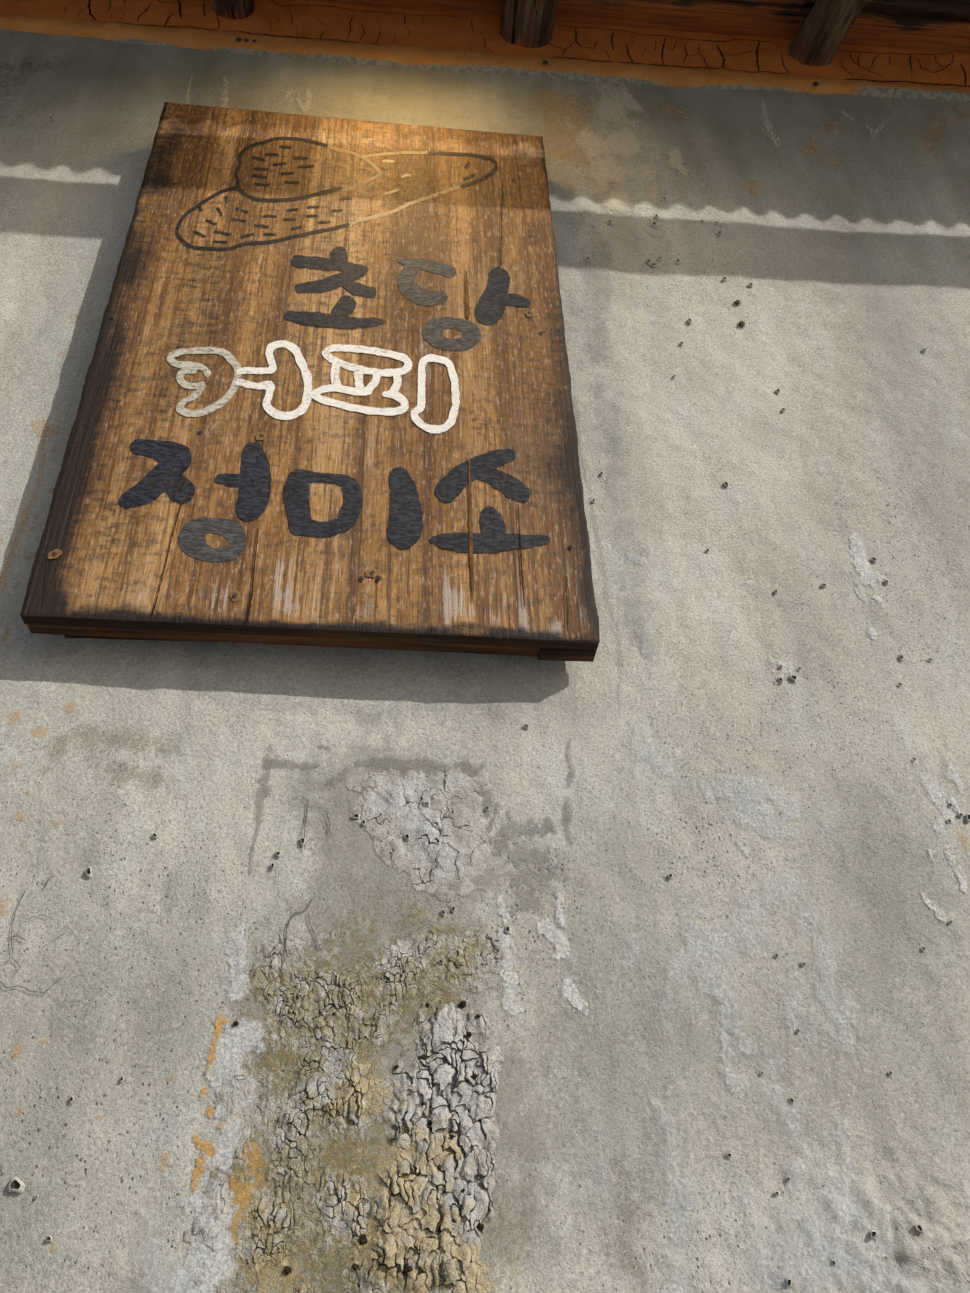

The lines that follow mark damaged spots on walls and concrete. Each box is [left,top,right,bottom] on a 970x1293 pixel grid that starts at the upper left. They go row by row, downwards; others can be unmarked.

crack [64,0,494,53]
crack [549,25,789,74]
crack [838,49,970,87]
crack [281,897,342,987]
corrosion [191,1015,266,1243]